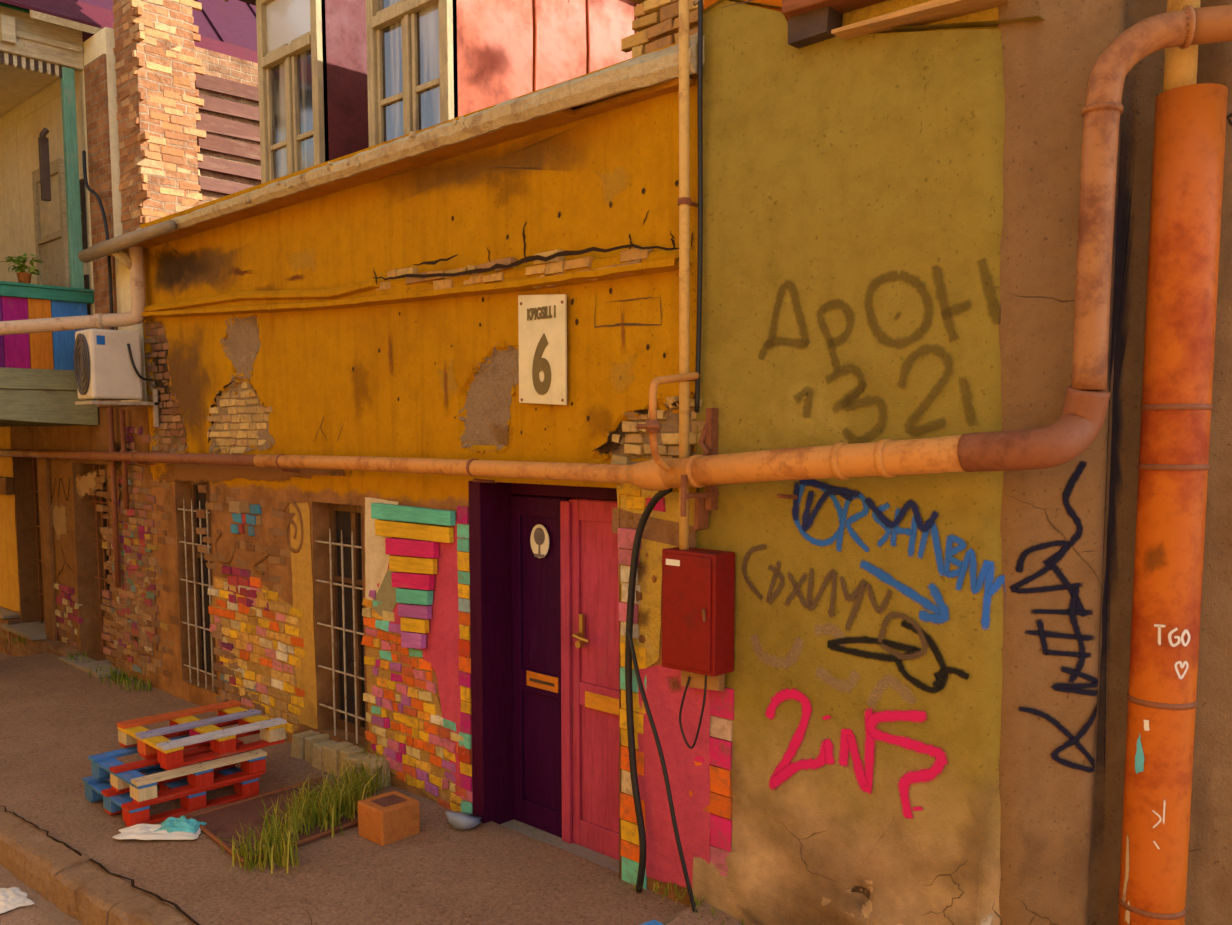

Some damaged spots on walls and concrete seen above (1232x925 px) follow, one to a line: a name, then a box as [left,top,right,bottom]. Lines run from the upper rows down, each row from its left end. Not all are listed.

crack [373,210,693,284]
crack [594,295,662,328]
flaking render [454,339,522,454]
flaking render [594,392,706,465]
flaking render [52,504,68,540]
flaking render [76,314,351,678]
crack [923,861,967,925]
crack [992,898,1059,925]